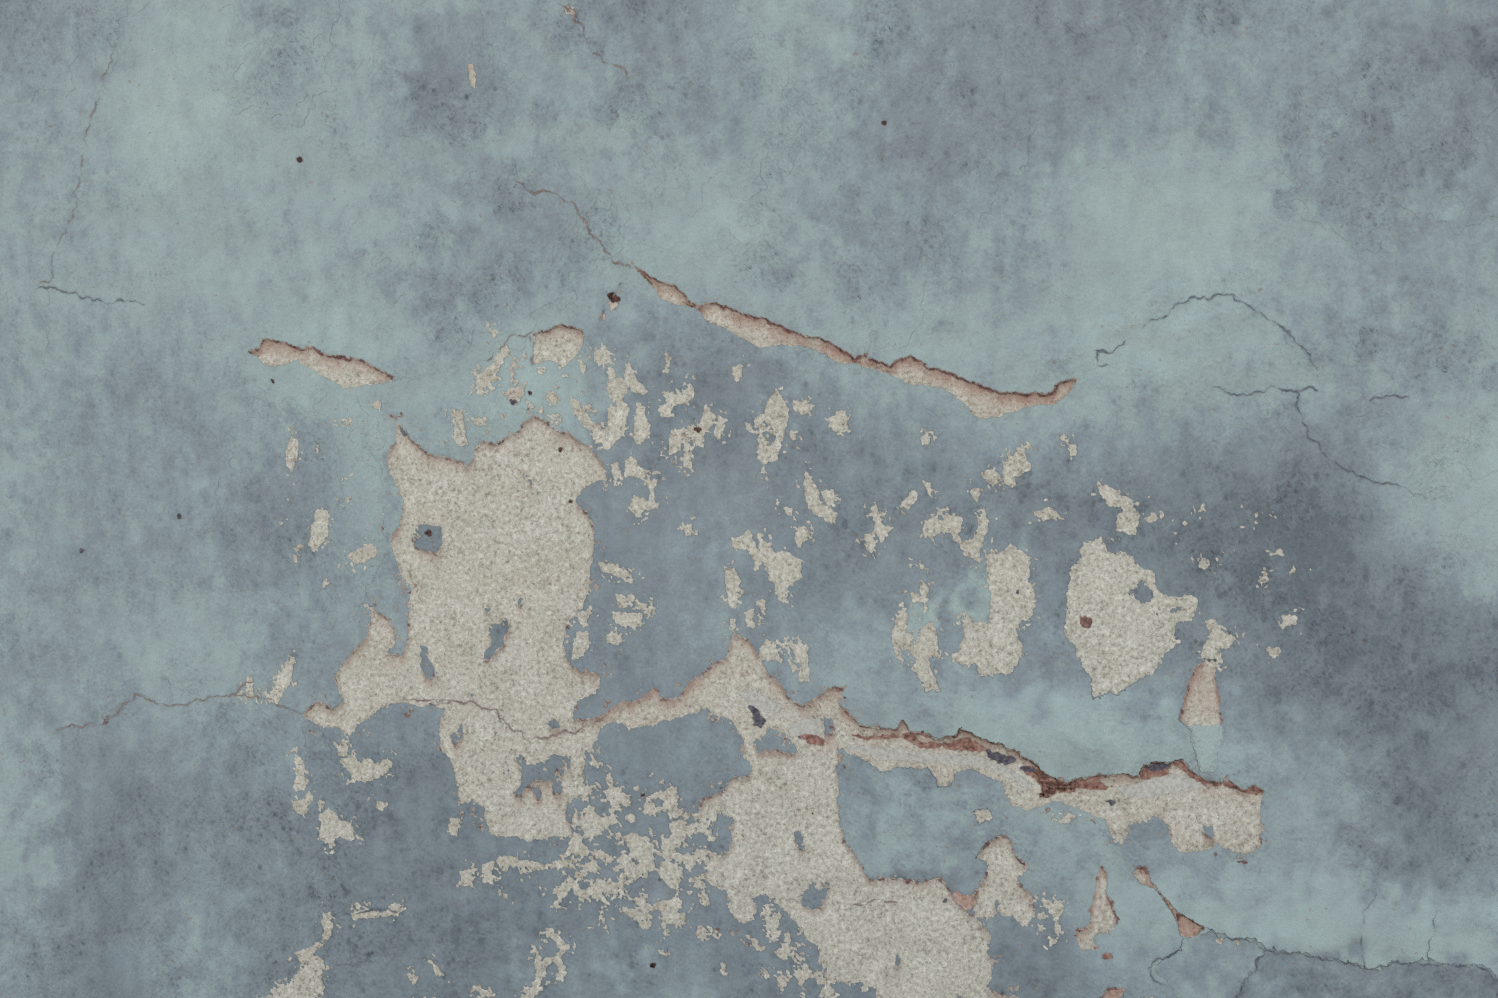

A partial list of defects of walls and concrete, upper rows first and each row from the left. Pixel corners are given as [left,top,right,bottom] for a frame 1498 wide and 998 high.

crack [557,3,627,77]
crack [513,179,634,321]
spalling [631,262,1077,419]
crack [1096,293,1428,499]
peeling [237,321,1311,998]
crack [1148,892,1498,998]